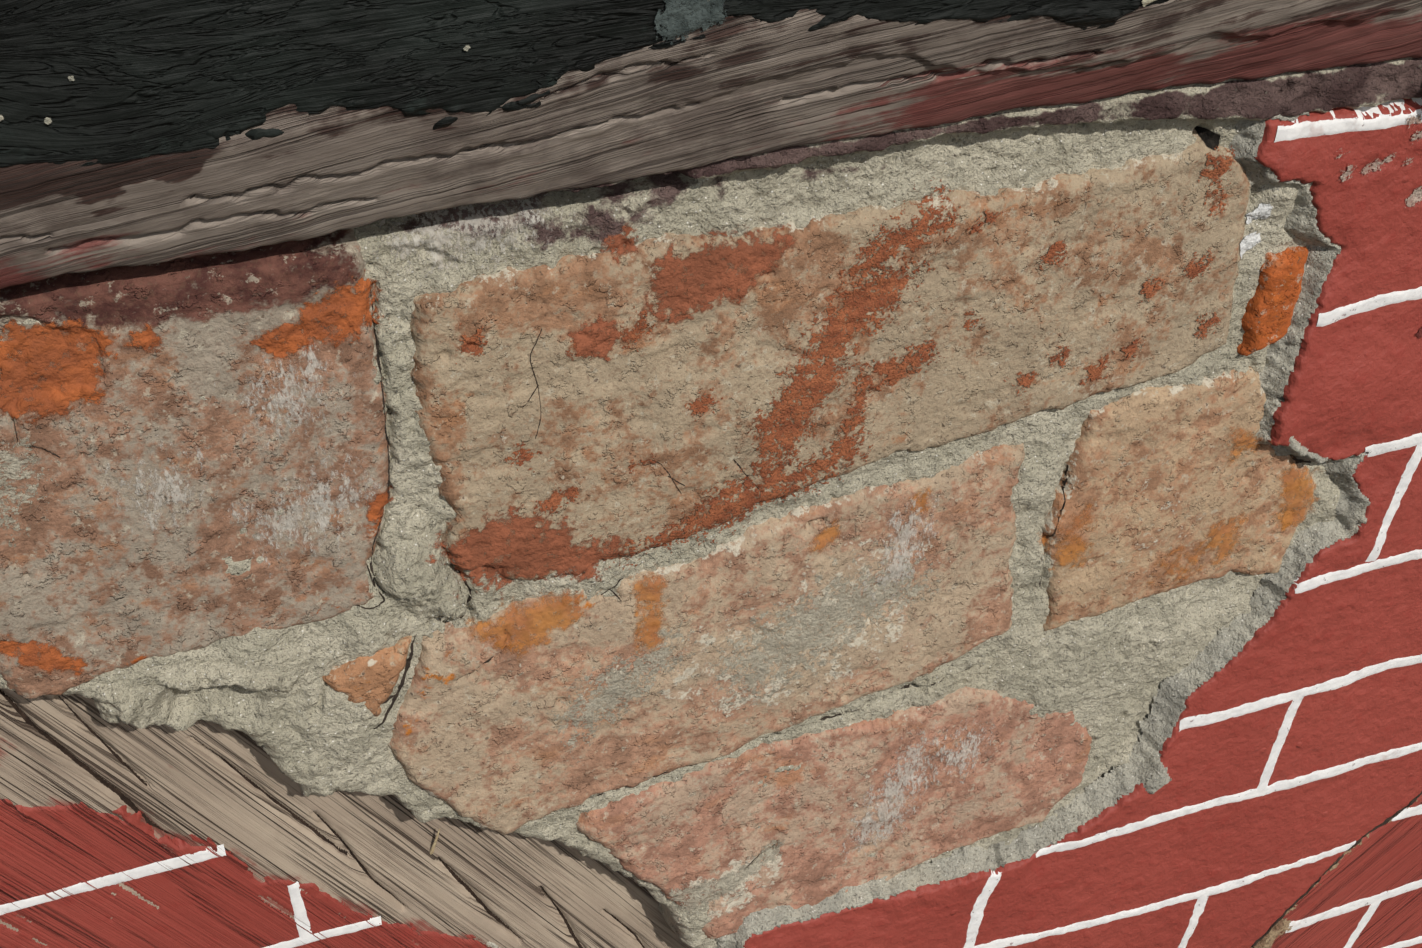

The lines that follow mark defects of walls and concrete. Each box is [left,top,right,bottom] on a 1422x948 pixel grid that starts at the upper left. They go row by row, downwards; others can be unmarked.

peeling [808,9,864,31]
peeling [206,126,284,140]
peeling [1336,107,1422,182]
spalling [250,269,381,359]
spalling [566,225,795,362]
spalling [0,319,164,423]
spalling [0,635,88,676]
spalling [366,485,394,522]
spalling [426,480,633,654]
spalling [634,573,666,650]
flaking render [715,112,1371,948]
crack [1250,792,1422,948]